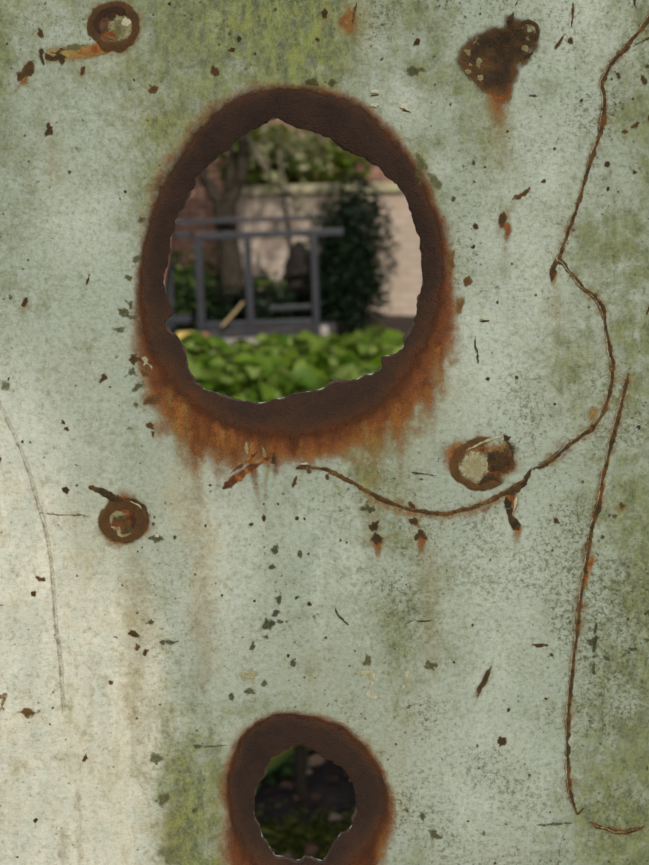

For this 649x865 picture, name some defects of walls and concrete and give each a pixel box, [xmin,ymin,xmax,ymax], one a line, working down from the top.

corrosion [17,1,140,84]
corrosion [457,2,541,123]
corrosion [134,85,457,489]
corrosion [88,485,149,546]
crack [292,14,649,835]
corrosion [445,434,516,491]
corrosion [222,712,395,865]